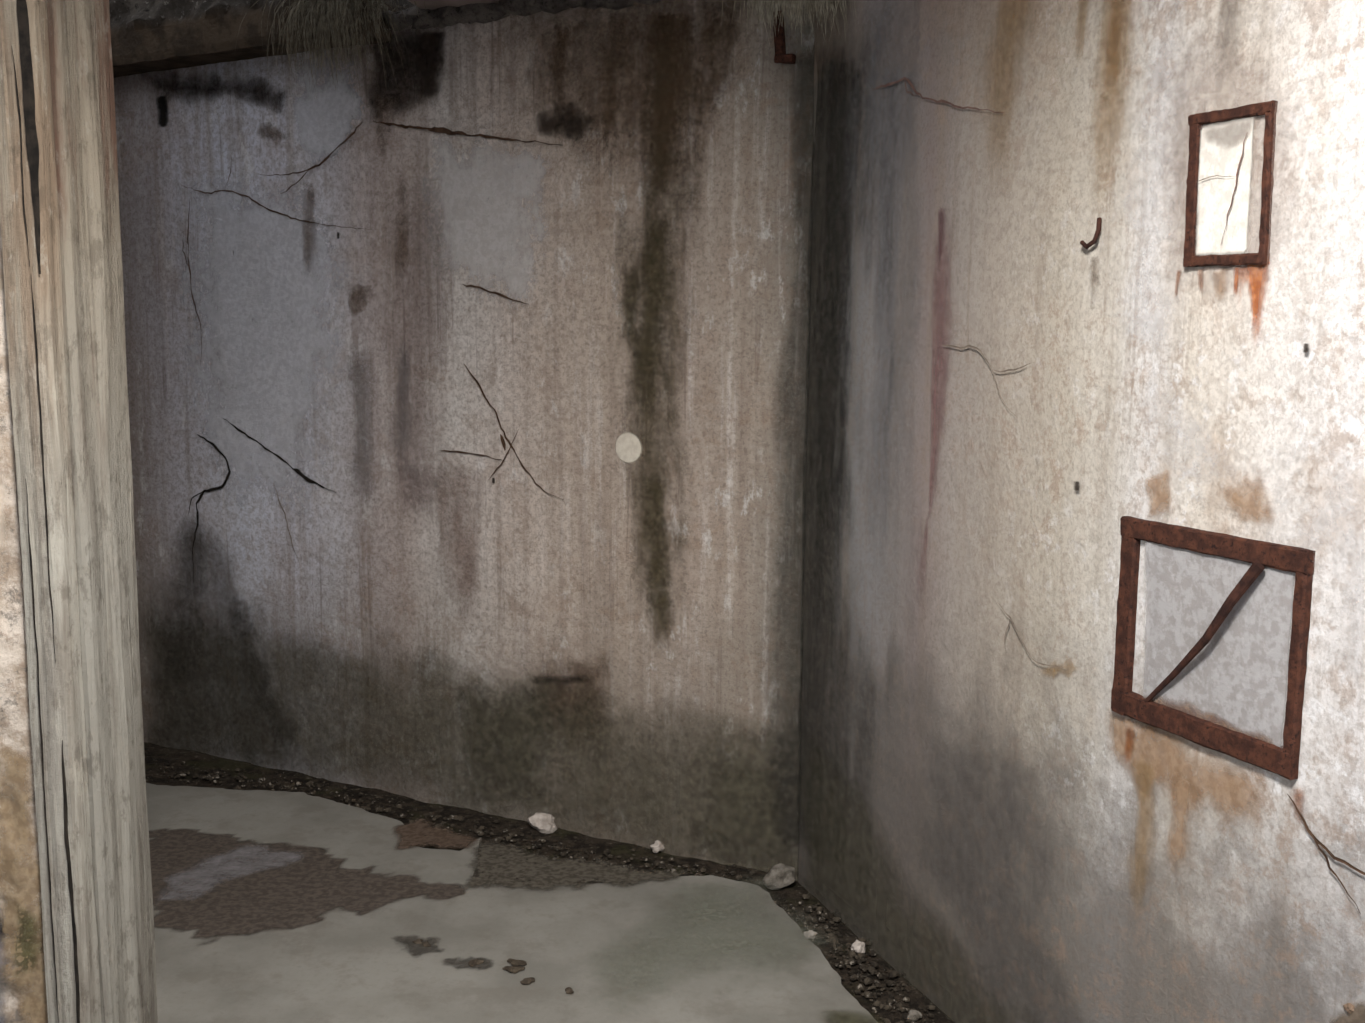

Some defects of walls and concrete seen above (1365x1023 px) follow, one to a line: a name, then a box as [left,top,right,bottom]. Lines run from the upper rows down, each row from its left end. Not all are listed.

leakage [154,32,442,162]
leakage [540,6,731,141]
rust [1103,0,1126,98]
crack [182,121,563,355]
rust [1199,264,1267,324]
crack [11,0,80,1023]
crack [188,419,336,583]
crack [440,364,564,500]
leakage [782,56,854,840]
rust [1113,718,1258,873]
crack [1287,794,1365,913]
spalling [1331,1003,1365,1023]